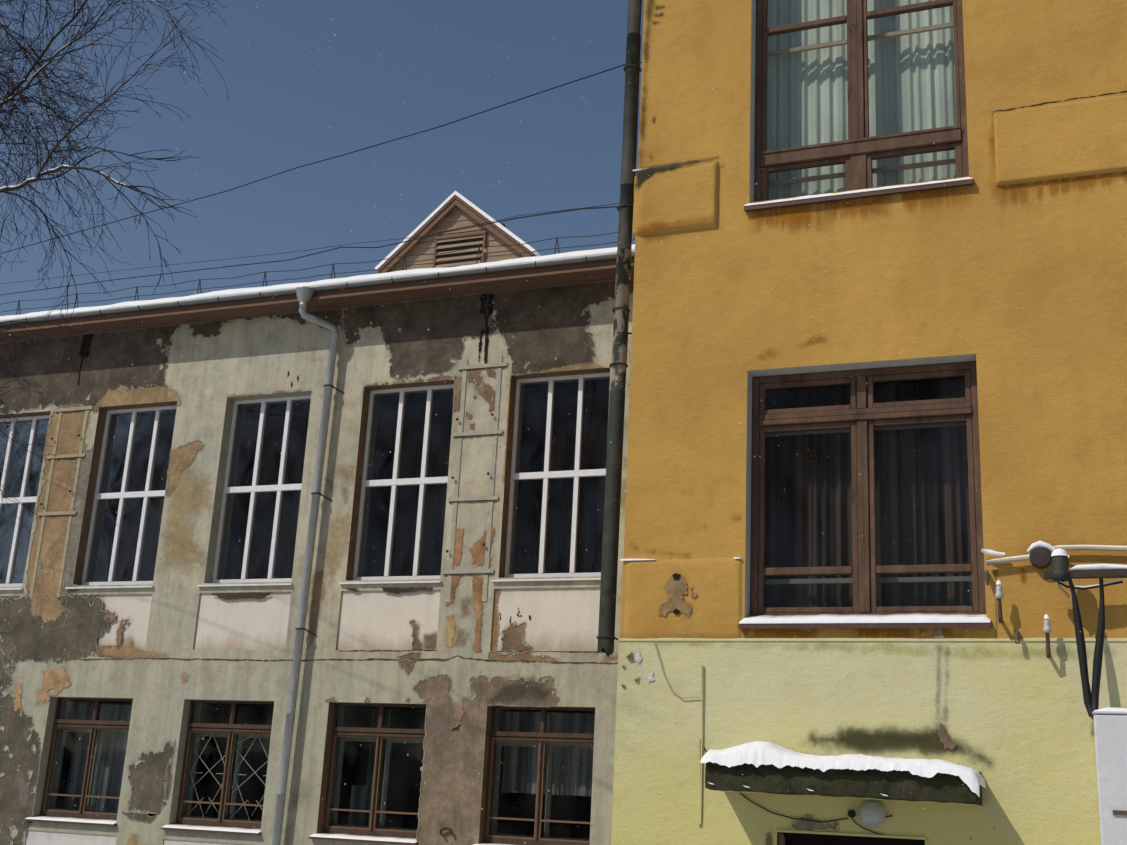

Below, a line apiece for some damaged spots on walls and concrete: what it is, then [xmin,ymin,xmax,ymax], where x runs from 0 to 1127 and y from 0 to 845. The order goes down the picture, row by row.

damp [635,157,718,188]
damp [478,293,494,364]
flaking render [0,280,616,845]
flaking render [621,651,654,689]